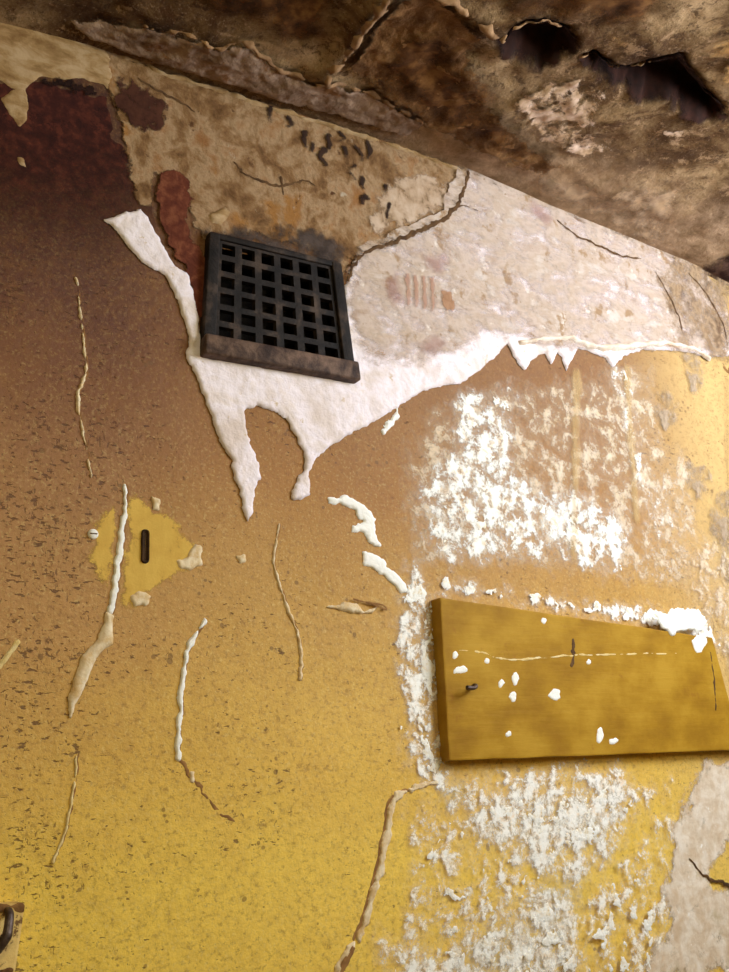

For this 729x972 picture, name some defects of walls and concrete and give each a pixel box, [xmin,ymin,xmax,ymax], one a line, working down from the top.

damp [0,77,169,204]
flaking render [0,0,729,521]
crack [347,170,478,282]
damp [350,166,729,391]
damp [494,17,729,125]
crack [107,484,130,614]
peeling [328,495,408,593]
damp [409,367,729,652]
crack [174,618,240,824]
crack [352,780,438,943]
damp [378,566,672,972]
flaking render [646,758,729,972]